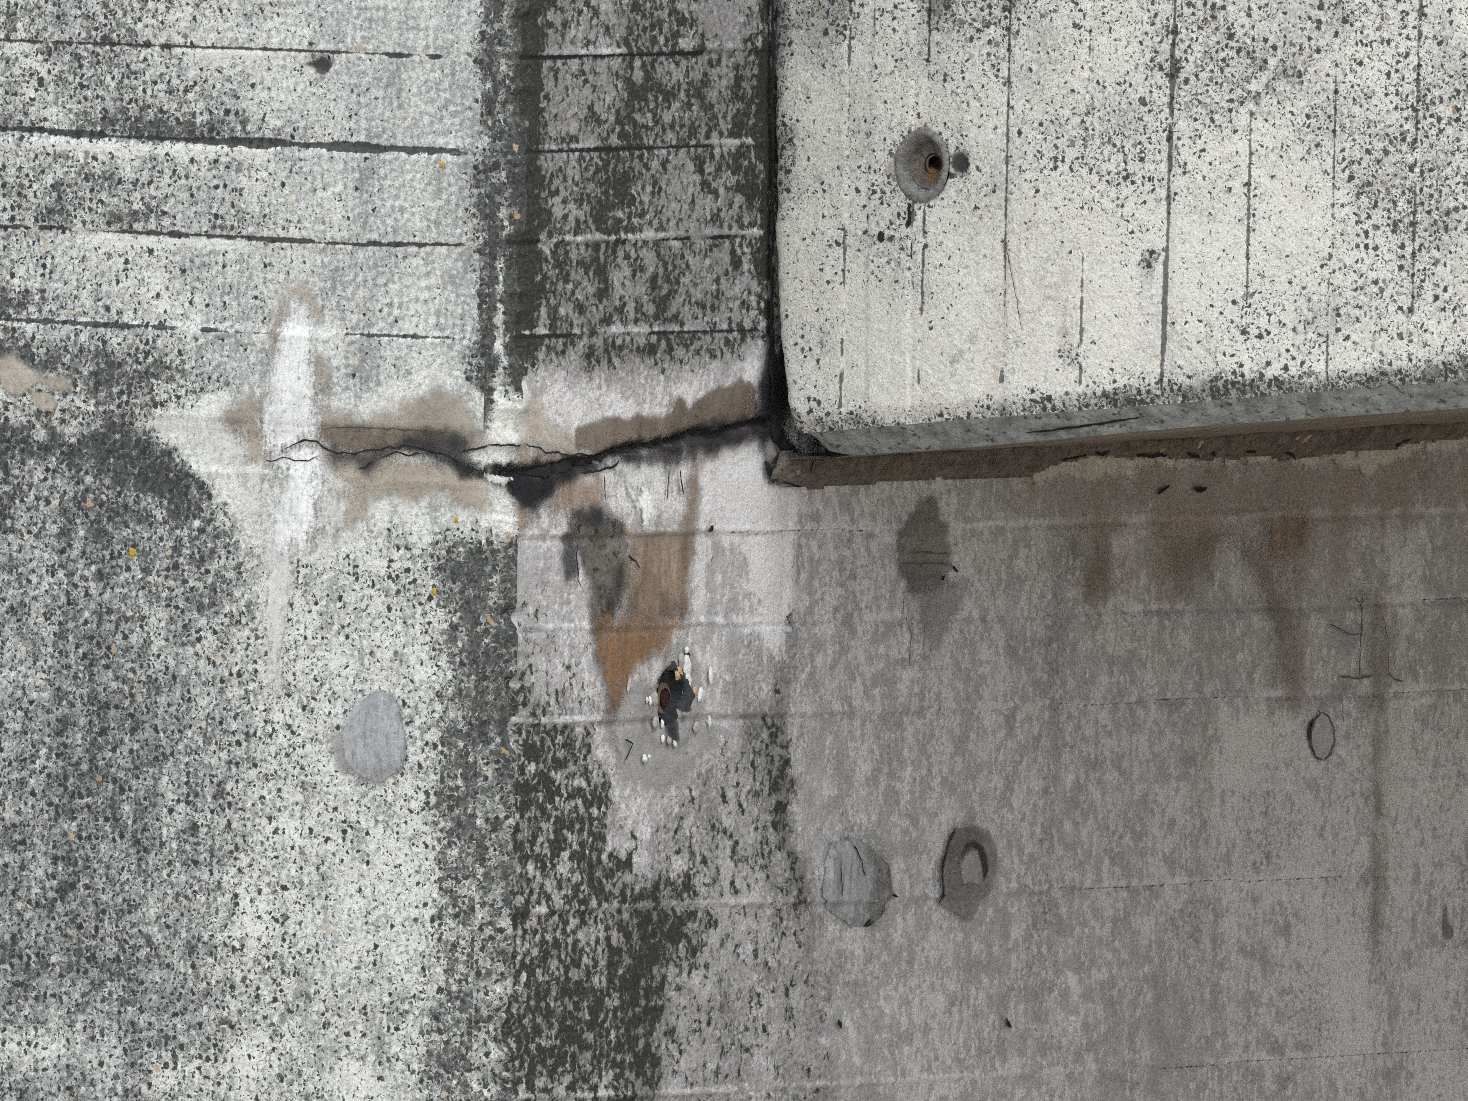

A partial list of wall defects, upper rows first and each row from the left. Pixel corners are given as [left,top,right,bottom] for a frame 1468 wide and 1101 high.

rust [924,153,942,183]
damp [147,282,791,692]
crack [264,420,762,499]
rust [553,463,699,716]